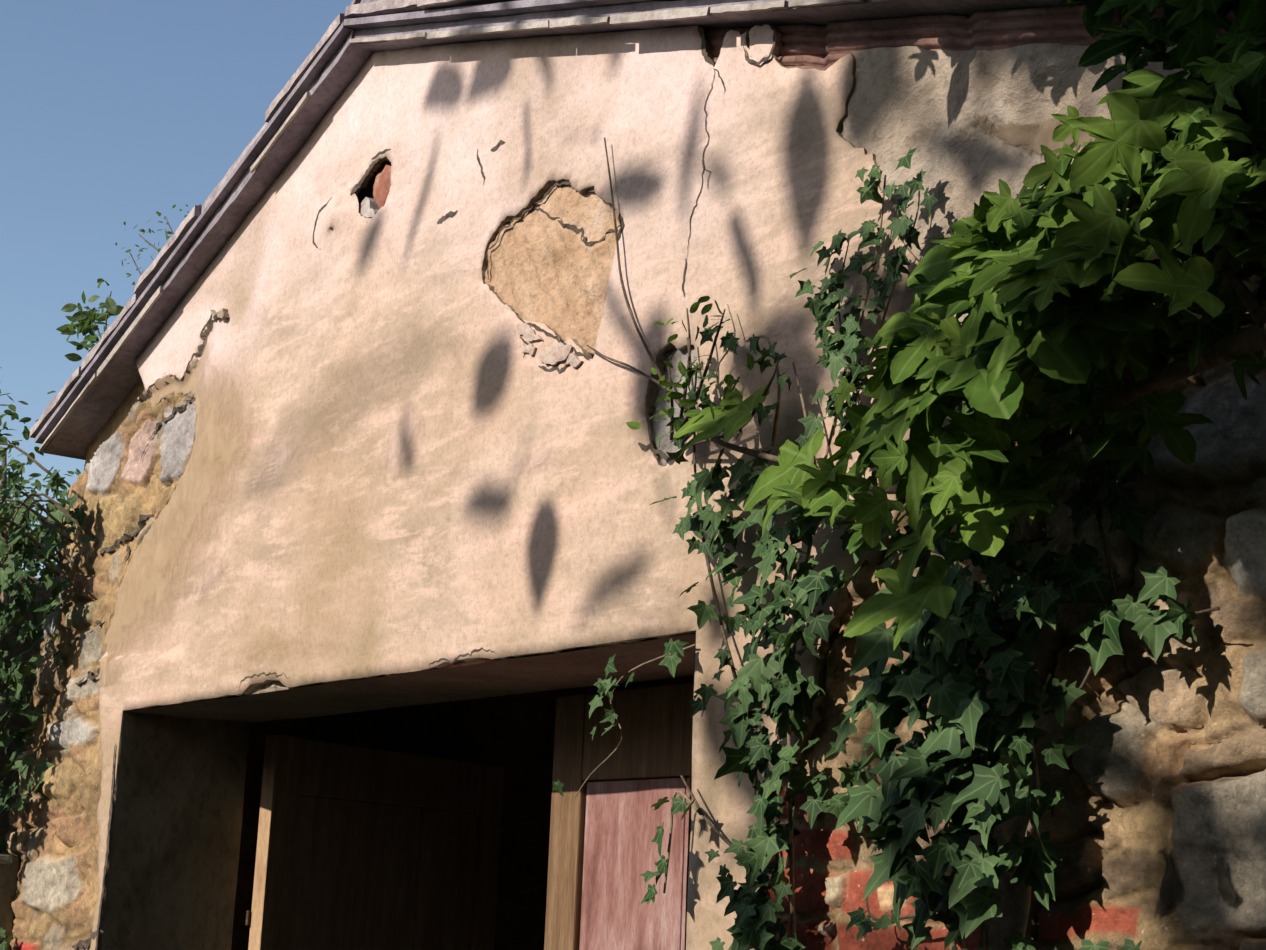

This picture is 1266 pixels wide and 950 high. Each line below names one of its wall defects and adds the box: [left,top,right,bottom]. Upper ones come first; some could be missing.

peeling [699,24,783,67]
spalling [350,158,380,196]
crack [477,140,505,183]
crack [682,68,725,293]
flaking render [843,43,1190,261]
flaking render [485,181,624,373]
spalling [645,342,701,466]
peeling [99,308,248,685]
spalling [239,672,296,696]